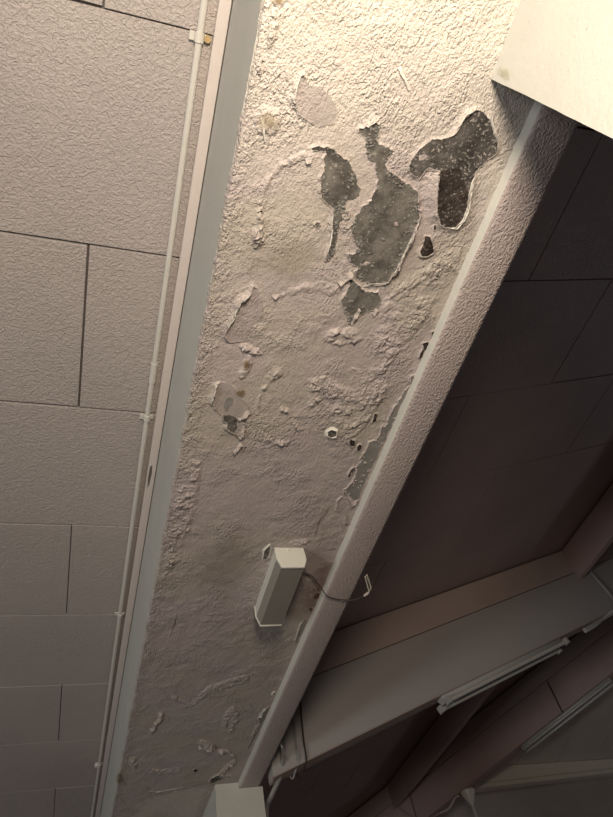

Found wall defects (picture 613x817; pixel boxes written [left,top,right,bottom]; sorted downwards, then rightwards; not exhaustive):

peeling [287,71,340,129]
flaking render [305,103,502,325]
peeling [221,282,266,354]
flaking render [416,330,435,360]
peeling [207,381,251,455]
flaking render [324,427,338,439]
peeling [334,373,415,529]
peeling [247,691,276,749]